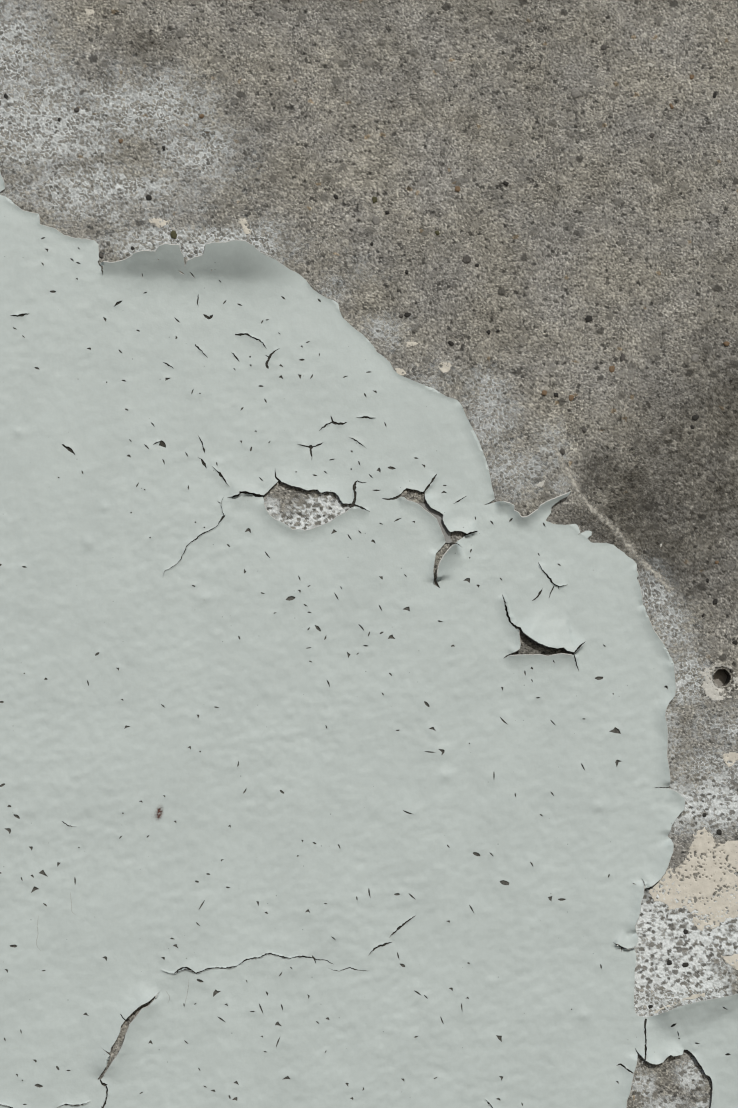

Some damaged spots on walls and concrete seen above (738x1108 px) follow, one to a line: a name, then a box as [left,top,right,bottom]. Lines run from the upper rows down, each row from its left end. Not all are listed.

peeling [0,172,94,245]
peeling [101,240,306,282]
crack [153,435,234,578]
peeling [228,466,370,541]
peeling [382,471,478,588]
peeling [496,491,571,528]
peeling [495,594,586,671]
peeling [613,565,685,949]
crack [156,913,416,1003]
peeling [87,984,166,1080]
peeling [627,1038,712,1108]